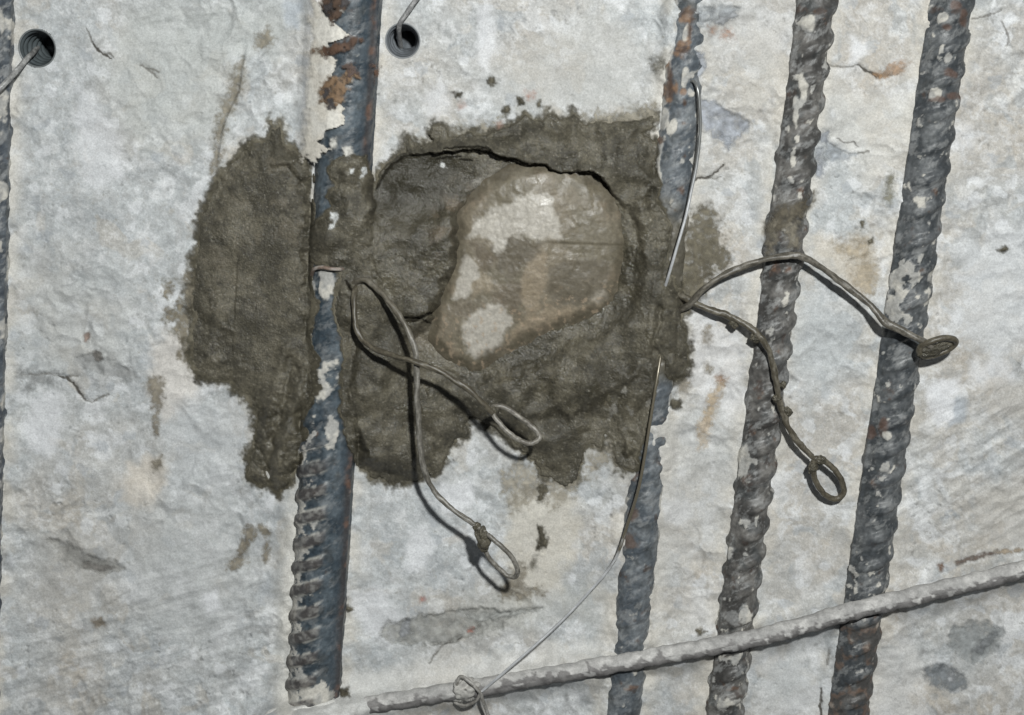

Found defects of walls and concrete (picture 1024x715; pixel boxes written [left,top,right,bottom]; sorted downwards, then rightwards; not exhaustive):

rust [318,0,350,26]
peeling [301,0,353,163]
rust [311,36,363,110]
spalling [697,52,707,77]
spalling [701,100,748,149]
crack [376,145,610,190]
spalling [815,131,856,176]
spalling [382,608,536,646]
spalling [949,620,1004,664]
spalling [925,663,967,691]